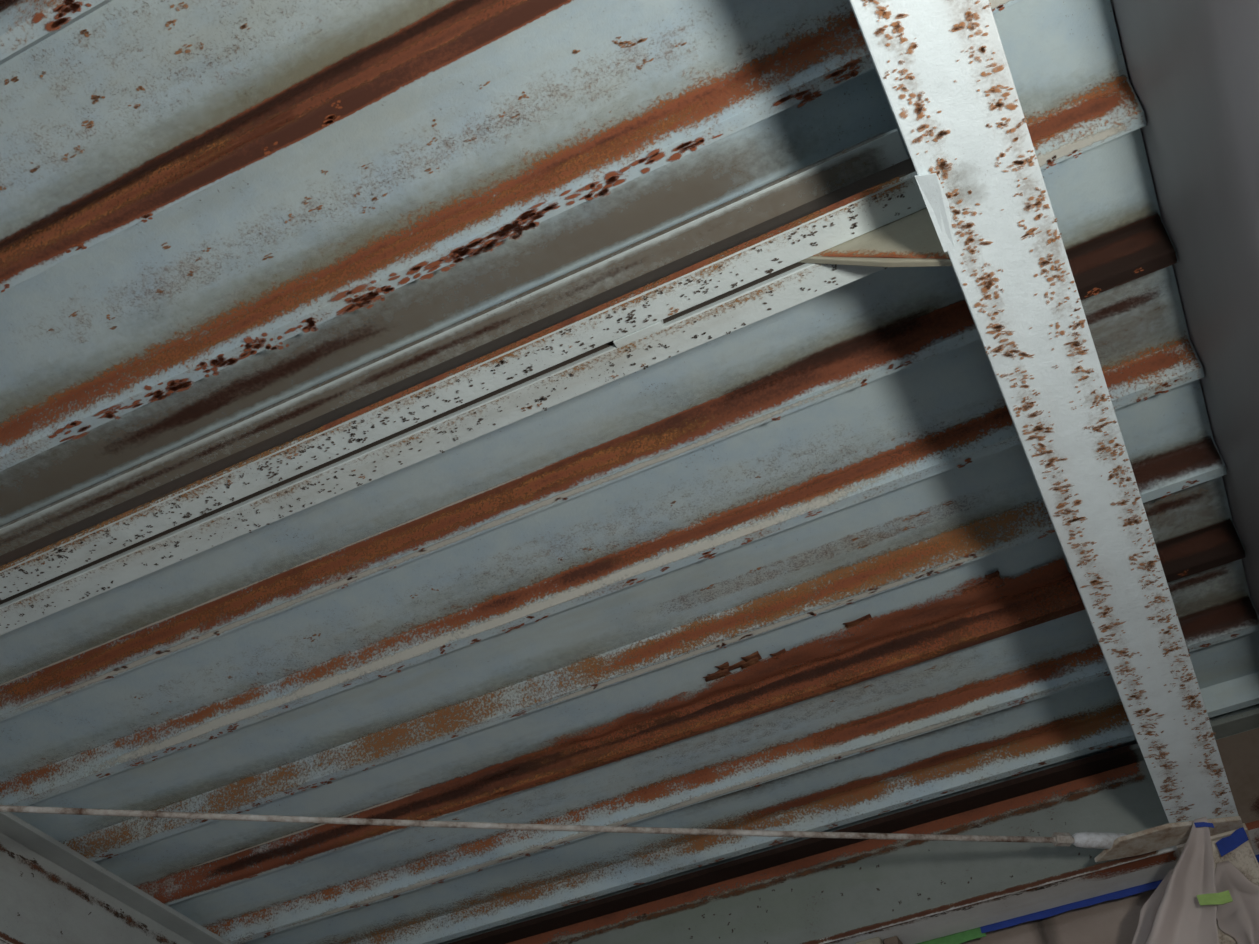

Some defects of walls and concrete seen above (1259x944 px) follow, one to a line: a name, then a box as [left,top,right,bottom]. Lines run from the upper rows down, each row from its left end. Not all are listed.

rust [0,0,950,470]
rust [0,158,1194,944]
rust [951,0,1259,816]